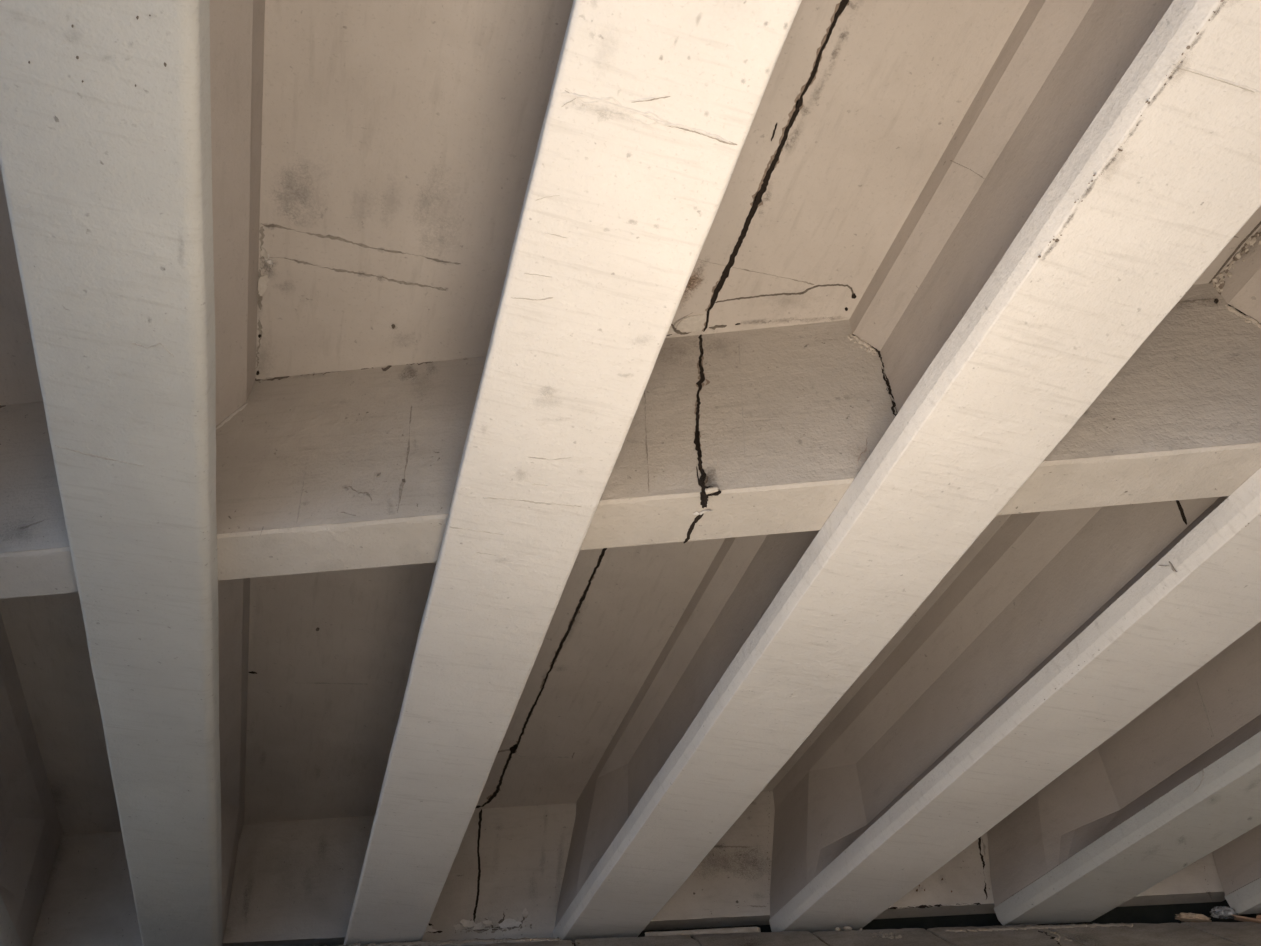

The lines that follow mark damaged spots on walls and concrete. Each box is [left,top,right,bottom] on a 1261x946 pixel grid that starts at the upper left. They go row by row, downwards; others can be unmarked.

crack [642,391,650,490]
crack [561,88,737,145]
crack [683,0,857,543]
crack [473,548,607,922]